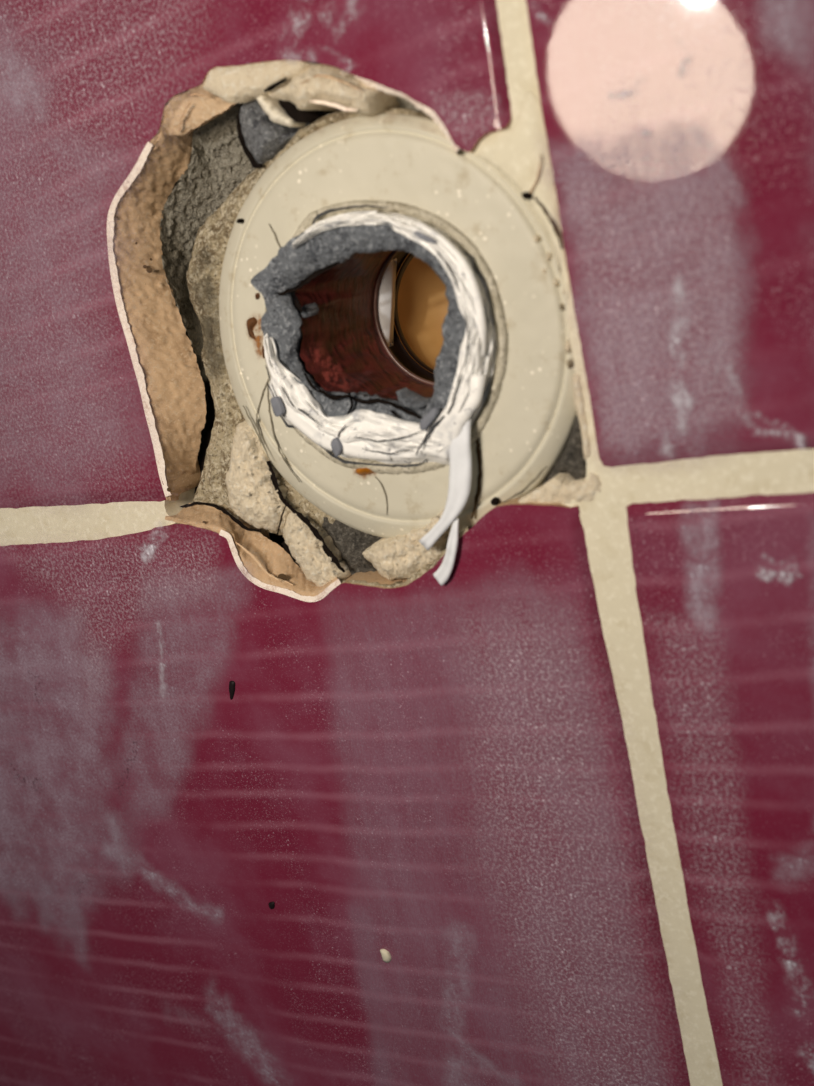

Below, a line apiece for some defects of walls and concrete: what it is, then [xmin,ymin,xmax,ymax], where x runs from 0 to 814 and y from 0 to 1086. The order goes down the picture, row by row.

spalling [354,75,459,155]
spalling [107,84,446,602]
peeling [565,339,574,369]